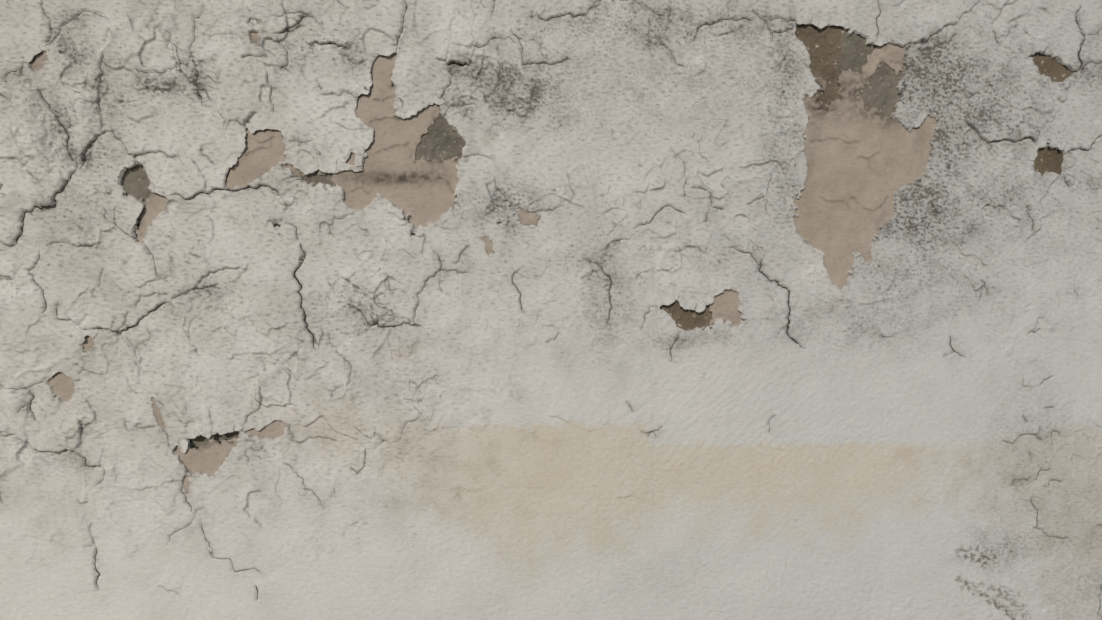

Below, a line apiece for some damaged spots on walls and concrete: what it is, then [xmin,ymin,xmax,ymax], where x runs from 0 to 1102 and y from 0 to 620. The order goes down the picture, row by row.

crack [1,0,230,376]
peeling [121,165,167,243]
crack [166,185,352,398]
peeling [225,46,466,228]
crack [438,0,599,98]
peeling [655,289,745,331]
crack [731,247,801,347]
peeling [793,17,938,290]
spalling [1029,140,1066,176]
crack [0,379,105,589]
peeling [173,416,288,496]
leakage [246,378,1102,620]